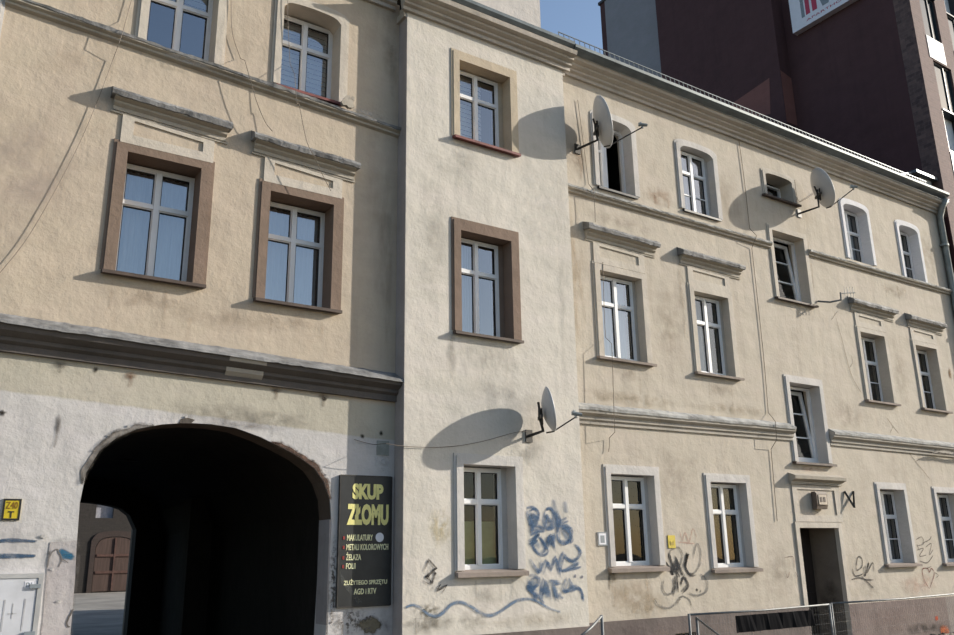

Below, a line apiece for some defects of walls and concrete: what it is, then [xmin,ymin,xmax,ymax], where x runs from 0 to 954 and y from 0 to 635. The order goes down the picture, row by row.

flaking render [81,424,154,483]
flaking render [272,442,331,499]
flaking render [330,558,382,634]